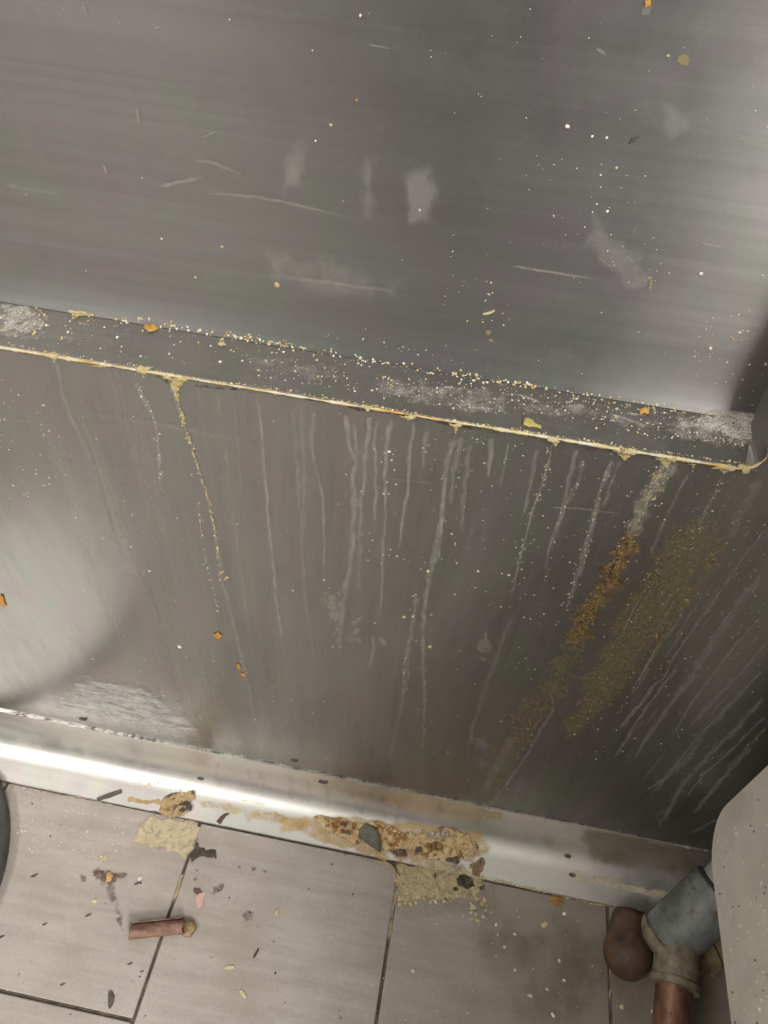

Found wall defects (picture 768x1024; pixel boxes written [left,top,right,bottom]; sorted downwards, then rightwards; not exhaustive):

rust [472,454,675,819]